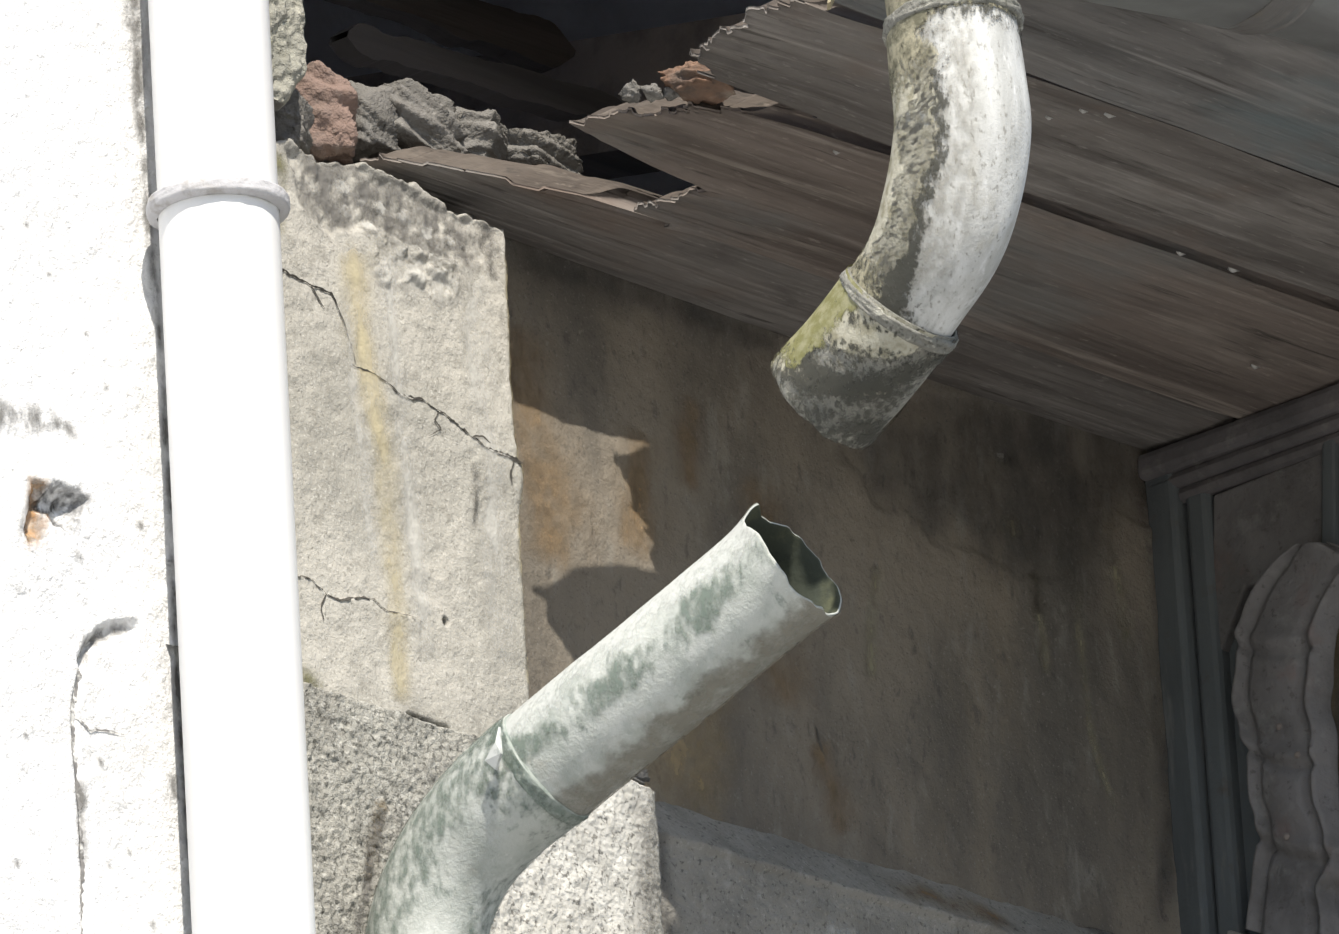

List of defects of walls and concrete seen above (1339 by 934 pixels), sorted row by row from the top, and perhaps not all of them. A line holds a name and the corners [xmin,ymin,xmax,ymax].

flaking render [301,155,482,264]
leakage [348,255,387,458]
crack [282,268,522,485]
spalling [24,484,76,541]
crack [298,575,417,619]
leakage [403,441,427,619]
crack [71,642,124,934]